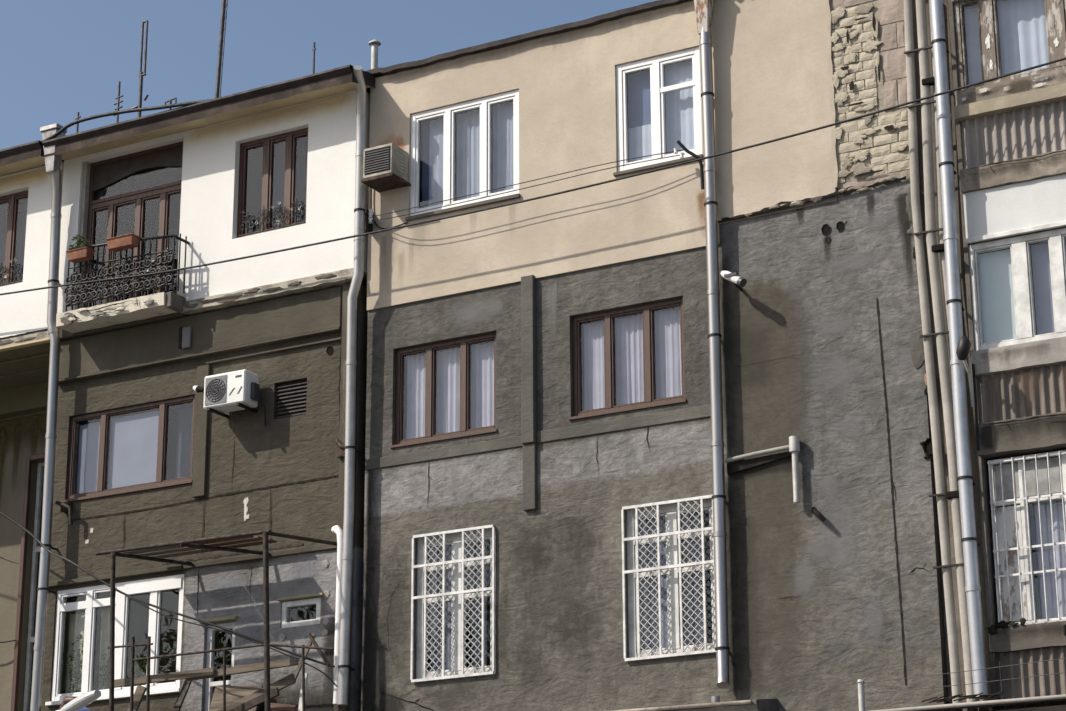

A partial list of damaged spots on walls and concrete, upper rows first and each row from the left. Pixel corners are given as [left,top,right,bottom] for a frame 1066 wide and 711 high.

peeling [983,15,993,70]
peeling [825,0,916,258]
spalling [821,220,847,250]
peeling [60,307,126,325]
damp [0,413,47,491]